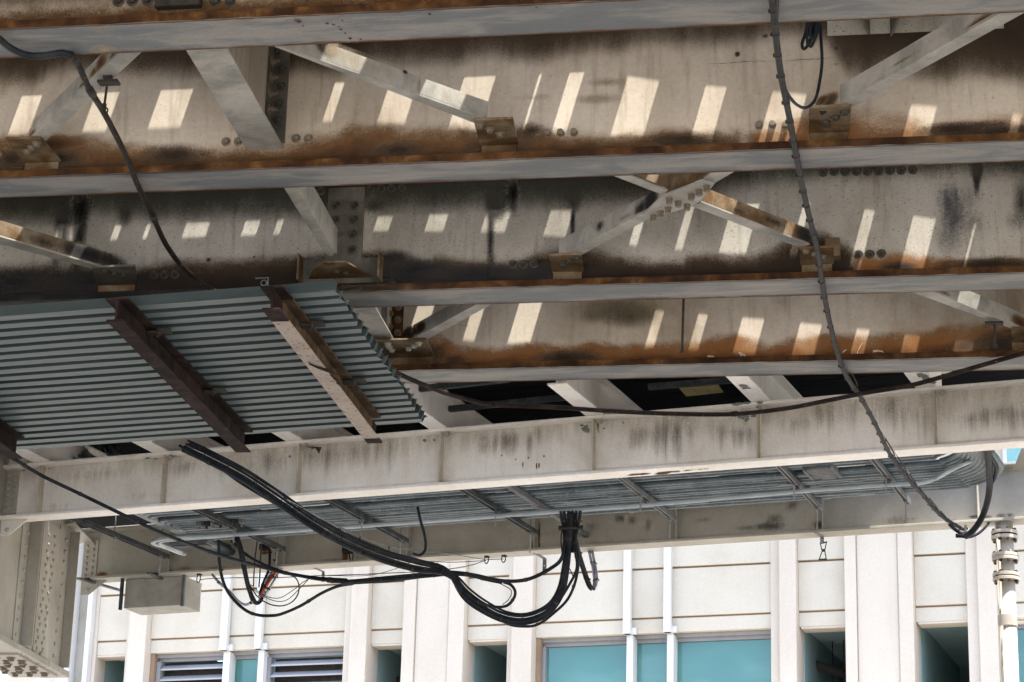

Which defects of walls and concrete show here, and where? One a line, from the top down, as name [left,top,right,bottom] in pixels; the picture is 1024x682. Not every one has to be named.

corrosion [0,0,639,31]
corrosion [76,11,1024,87]
corrosion [815,92,839,105]
corrosion [0,115,1024,179]
corrosion [135,255,325,291]
corrosion [337,251,564,293]
corrosion [580,234,829,286]
corrosion [826,245,1024,279]
corrosion [569,293,880,302]
corrosion [400,314,1024,383]